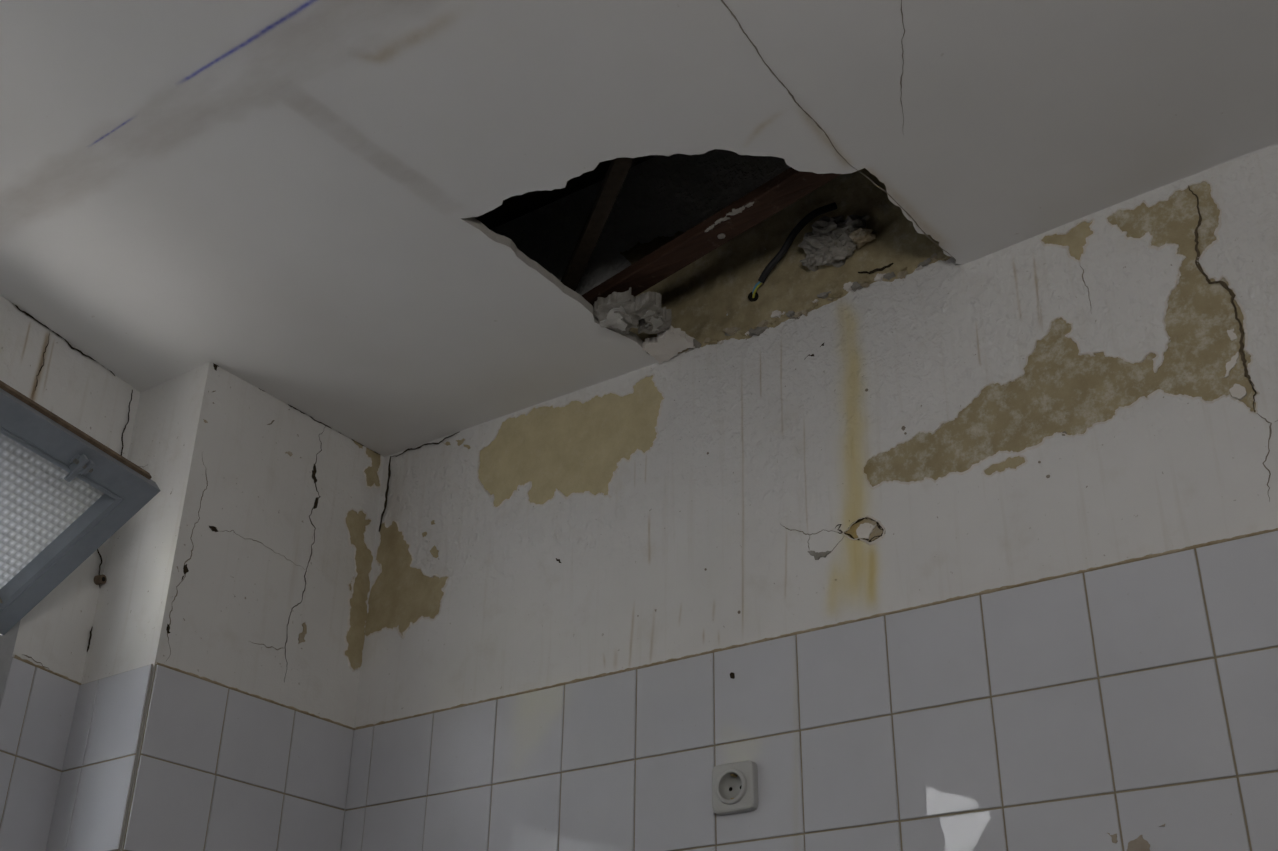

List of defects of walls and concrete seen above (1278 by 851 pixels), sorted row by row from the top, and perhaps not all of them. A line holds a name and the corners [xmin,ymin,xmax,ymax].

crack [721,0,956,260]
crack [166,389,458,680]
peeling [343,508,449,672]
peeling [445,374,665,508]
spalling [620,168,951,354]
peeling [862,180,1260,490]
crack [1188,186,1278,501]